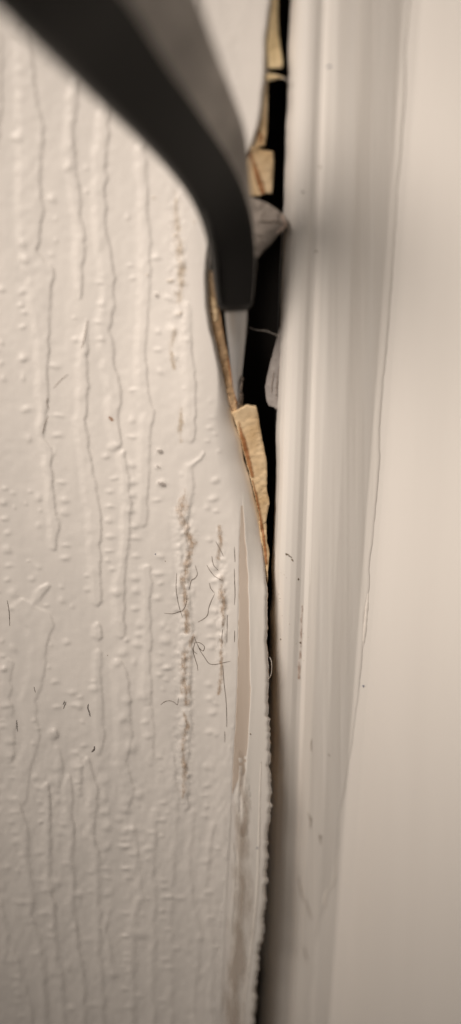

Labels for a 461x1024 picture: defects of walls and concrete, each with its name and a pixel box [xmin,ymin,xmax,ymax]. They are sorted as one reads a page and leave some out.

spalling [248,0,285,196]
crack [220,0,288,646]
crack [252,972,260,1024]